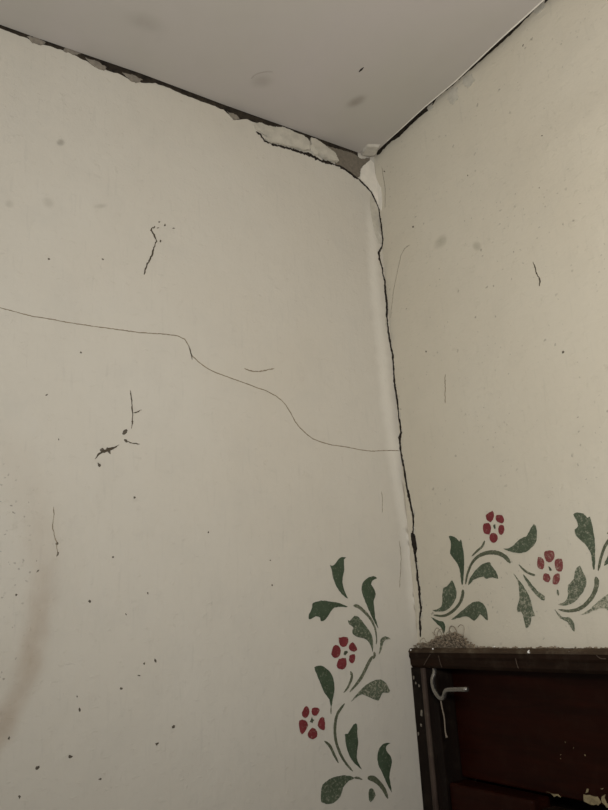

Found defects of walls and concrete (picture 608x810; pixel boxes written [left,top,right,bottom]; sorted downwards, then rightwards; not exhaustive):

crack [0,25,358,156]
crack [377,0,548,155]
damp [0,402,68,761]
crack [0,178,423,637]
peeling [254,122,417,640]